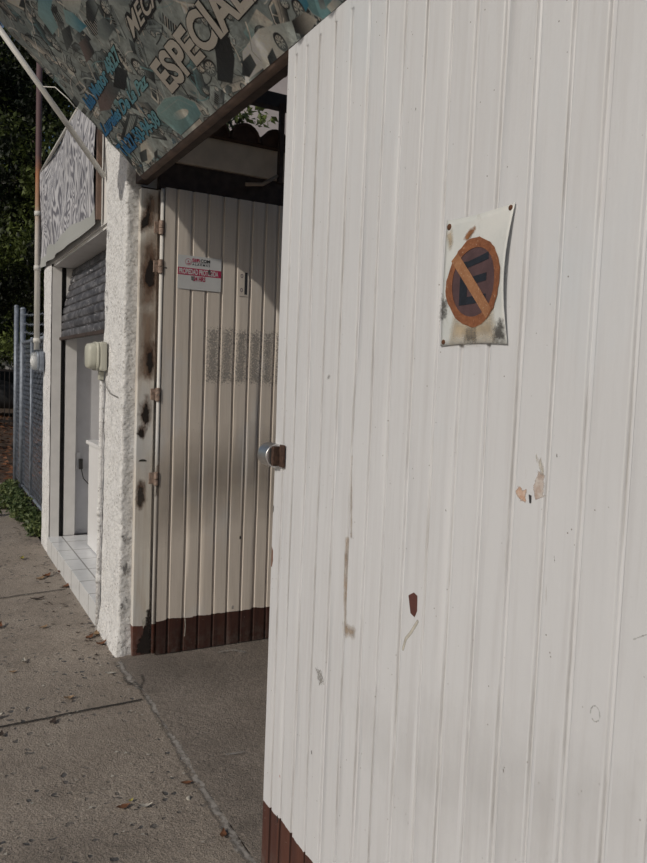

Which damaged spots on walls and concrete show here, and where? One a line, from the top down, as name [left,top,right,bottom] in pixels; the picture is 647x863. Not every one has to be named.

peeling [516,460,544,503]